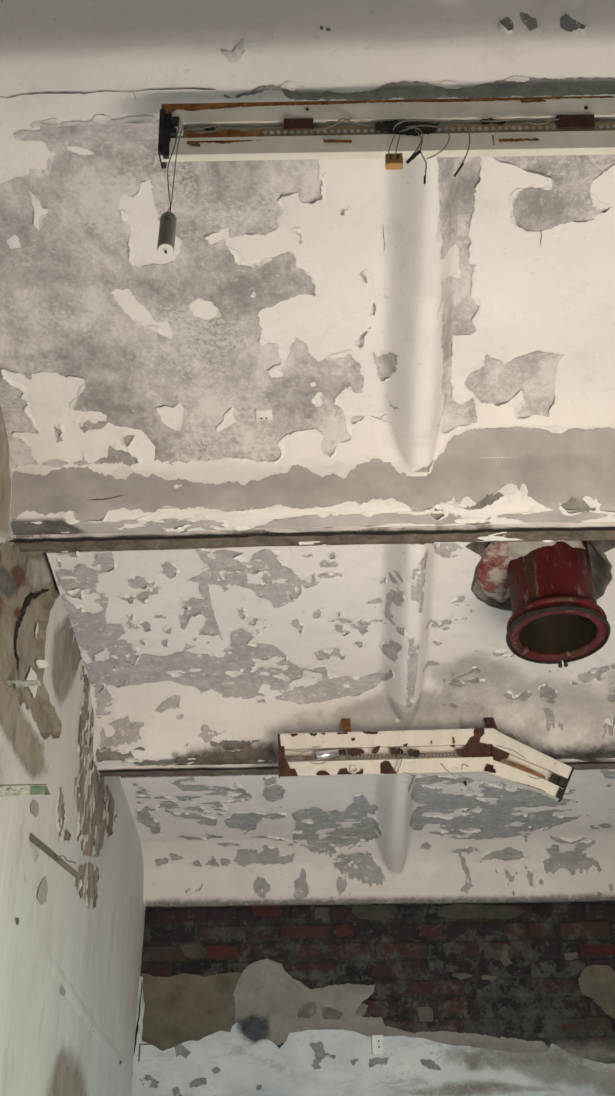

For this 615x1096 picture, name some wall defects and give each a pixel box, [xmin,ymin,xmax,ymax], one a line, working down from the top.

rust [161,96,613,114]
rust [187,129,264,147]
leakage [0,407,615,553]
peeling [0,115,615,908]
rust [347,748,364,757]
rust [390,748,420,758]
rust [452,737,546,793]
flaking render [132,731,615,1070]